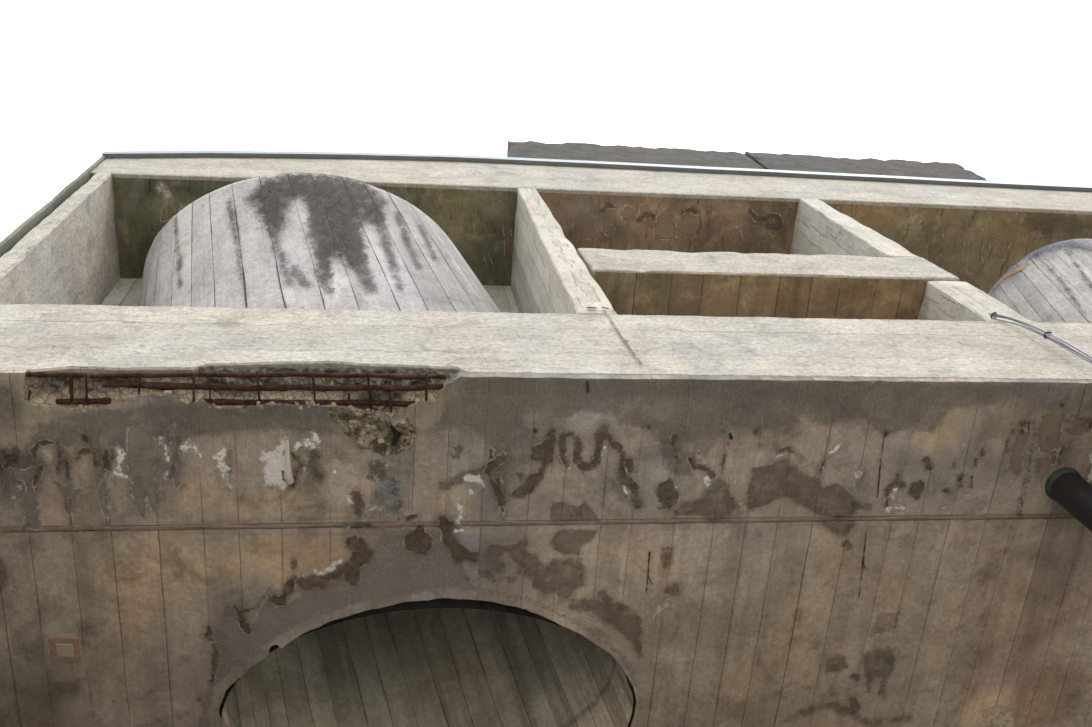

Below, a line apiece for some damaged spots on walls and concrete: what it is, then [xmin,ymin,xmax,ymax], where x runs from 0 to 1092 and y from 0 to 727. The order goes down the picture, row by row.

water stain [227,200,242,275]
water stain [247,172,437,292]
spalling [24,366,458,457]
water stain [0,379,1002,727]